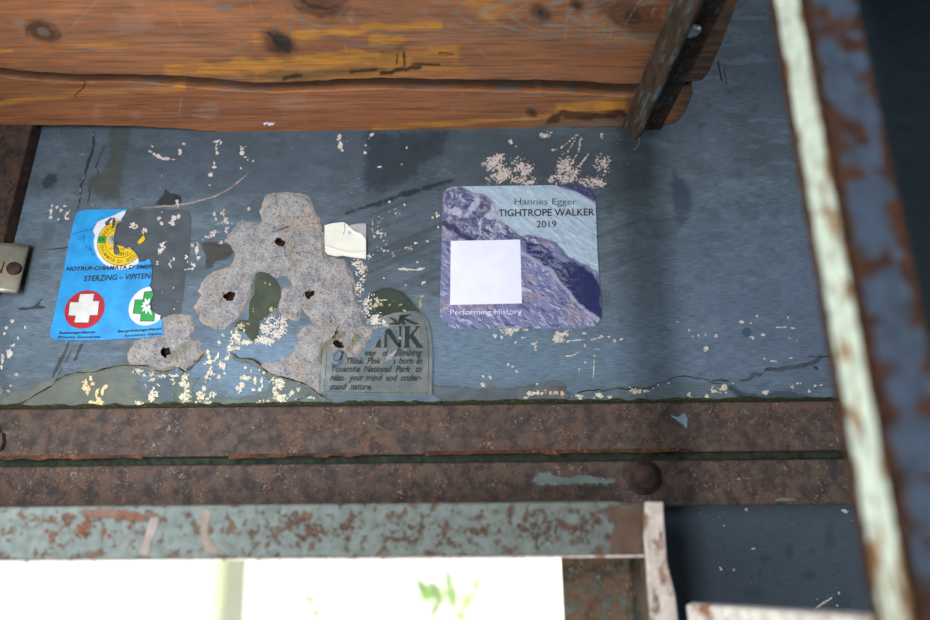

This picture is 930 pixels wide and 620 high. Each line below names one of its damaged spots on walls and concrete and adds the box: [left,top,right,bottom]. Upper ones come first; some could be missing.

peeling [481,134,611,189]
spalling [127,192,407,405]
rust [0,509,159,556]
rust [200,509,219,554]
rust [264,510,366,549]
rust [381,503,644,560]